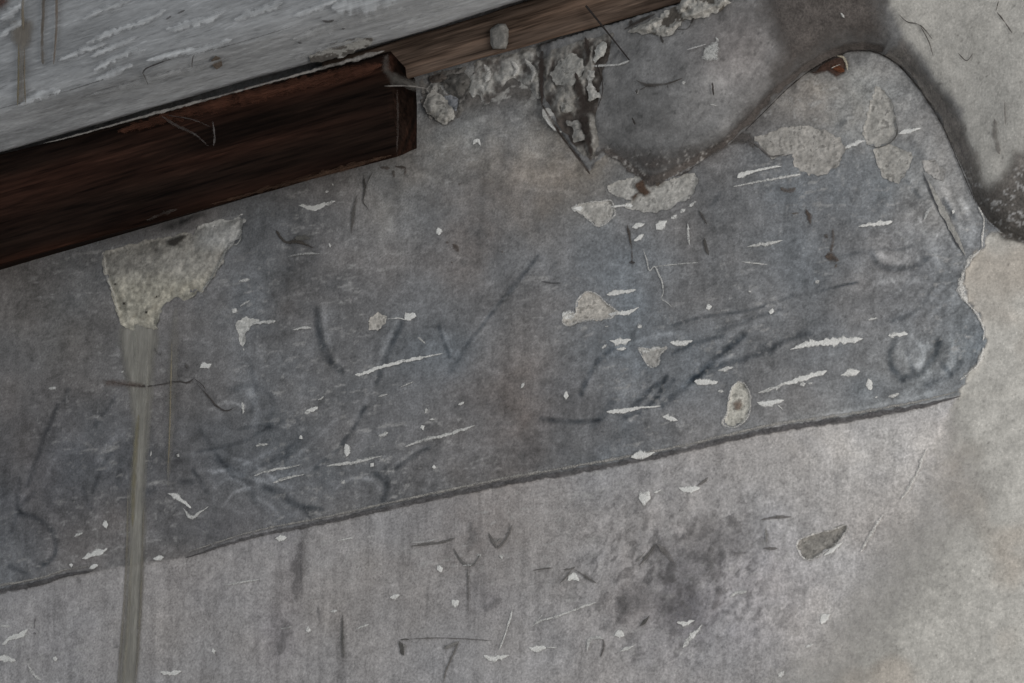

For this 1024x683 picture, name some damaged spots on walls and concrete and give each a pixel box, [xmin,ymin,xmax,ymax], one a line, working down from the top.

rust [812,56,848,77]
spalling [419,32,628,174]
spalling [754,125,847,176]
spalling [862,86,945,184]
spalling [571,173,698,241]
spalling [562,291,618,327]
crack [103,363,235,411]
spalling [694,379,752,428]
peeling [631,451,655,459]
flaking render [817,207,1024,683]
leakage [117,323,158,683]
spalling [796,524,848,561]